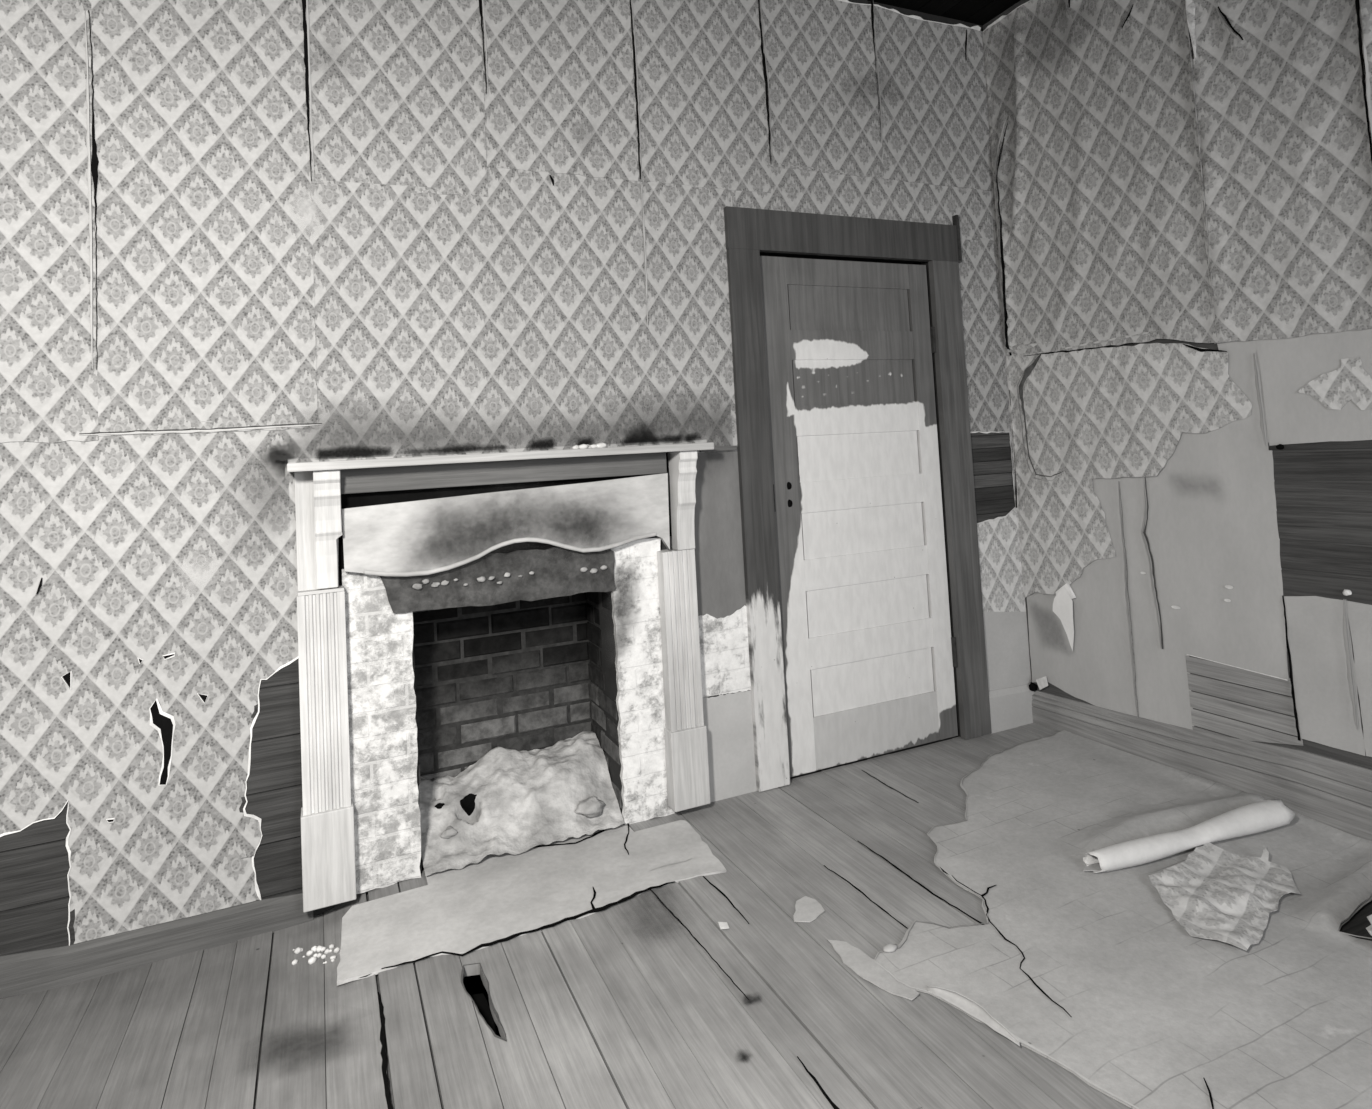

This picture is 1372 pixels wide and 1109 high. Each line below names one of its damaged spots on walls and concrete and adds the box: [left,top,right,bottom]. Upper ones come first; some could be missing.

crack [302,0,314,181]
crack [479,0,488,92]
crack [630,0,642,179]
crack [85,10,99,369]
peeling [1268,440,1372,605]
peeling [234,657,303,901]
peeling [1185,654,1304,746]
peeling [0,800,75,956]
crack [360,823,692,978]
crack [940,867,1072,1017]